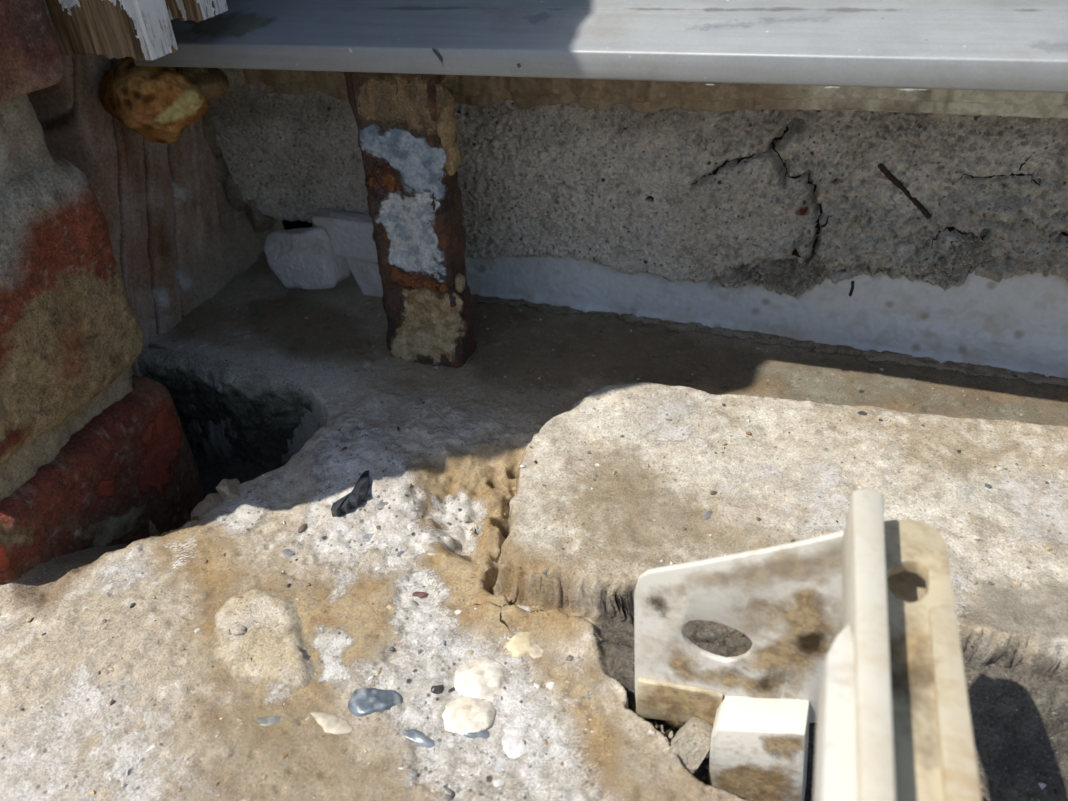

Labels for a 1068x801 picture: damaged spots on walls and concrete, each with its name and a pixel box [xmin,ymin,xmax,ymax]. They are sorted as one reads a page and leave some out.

rust [364,151,402,195]
crack [693,122,833,258]
crack [960,154,1058,186]
crack [927,226,987,248]
rust [389,266,449,294]
spalling [91,548,154,596]
spalling [137,347,607,801]
crack [464,603,509,629]
peeling [0,662,222,801]